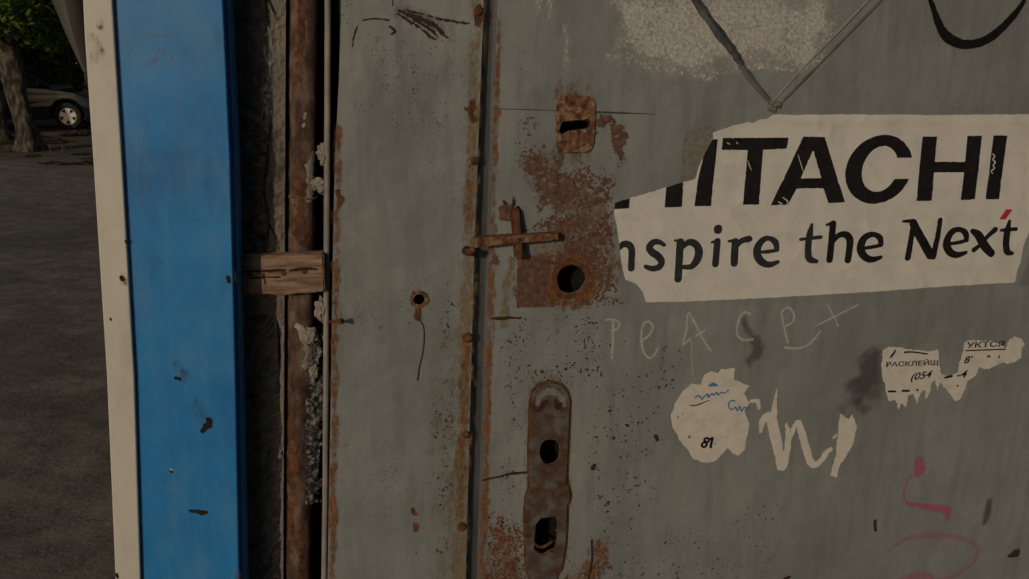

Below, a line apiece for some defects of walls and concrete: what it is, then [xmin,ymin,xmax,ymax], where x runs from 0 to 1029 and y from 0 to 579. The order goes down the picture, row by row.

corrosion [331,126,345,443]
corrosion [446,31,608,579]
peeling [200,417,213,433]
corrosion [285,404,307,579]
corrosion [329,463,338,576]